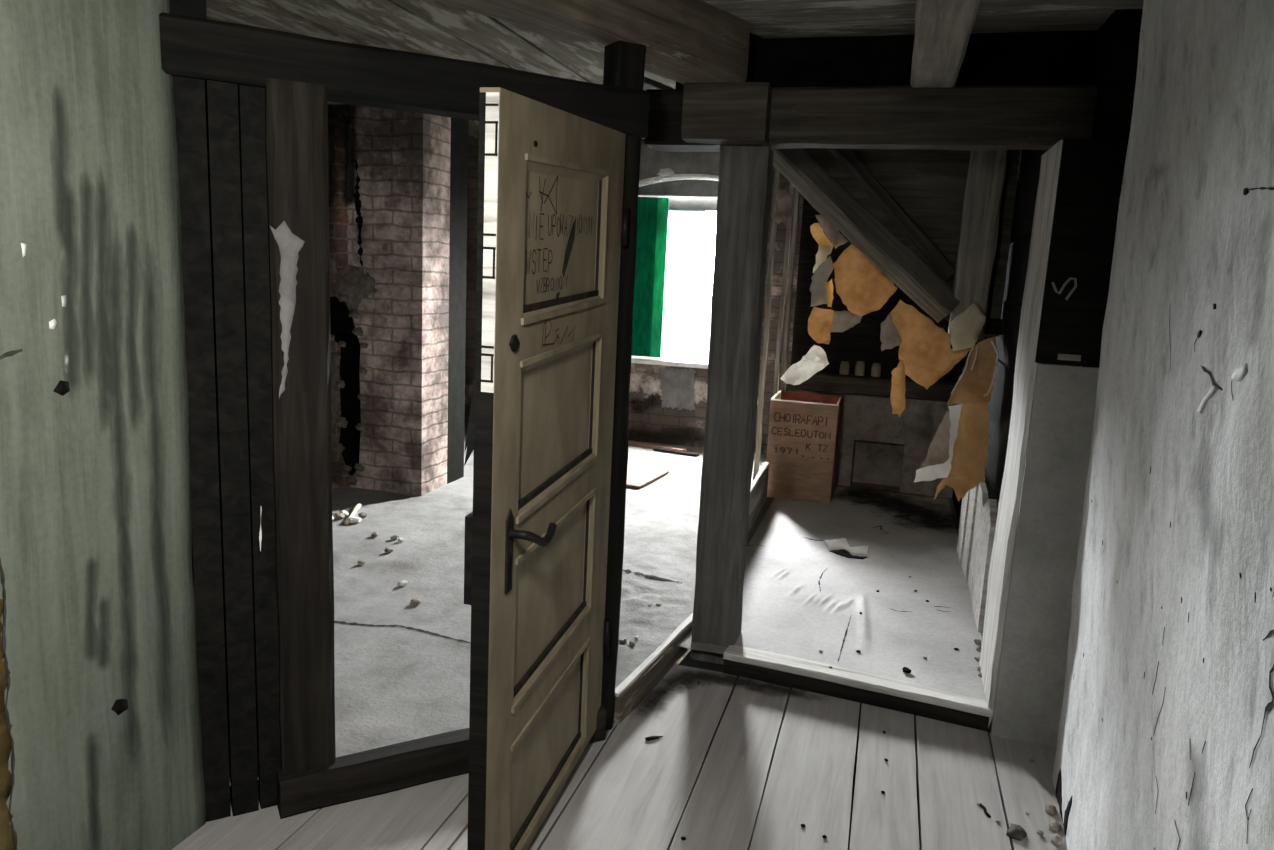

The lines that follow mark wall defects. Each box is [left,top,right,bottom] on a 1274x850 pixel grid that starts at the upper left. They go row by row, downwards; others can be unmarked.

peeling [269,221,304,398]
flaking render [1194,330,1247,414]
flaking render [0,558,17,850]
crack [1245,630,1274,844]